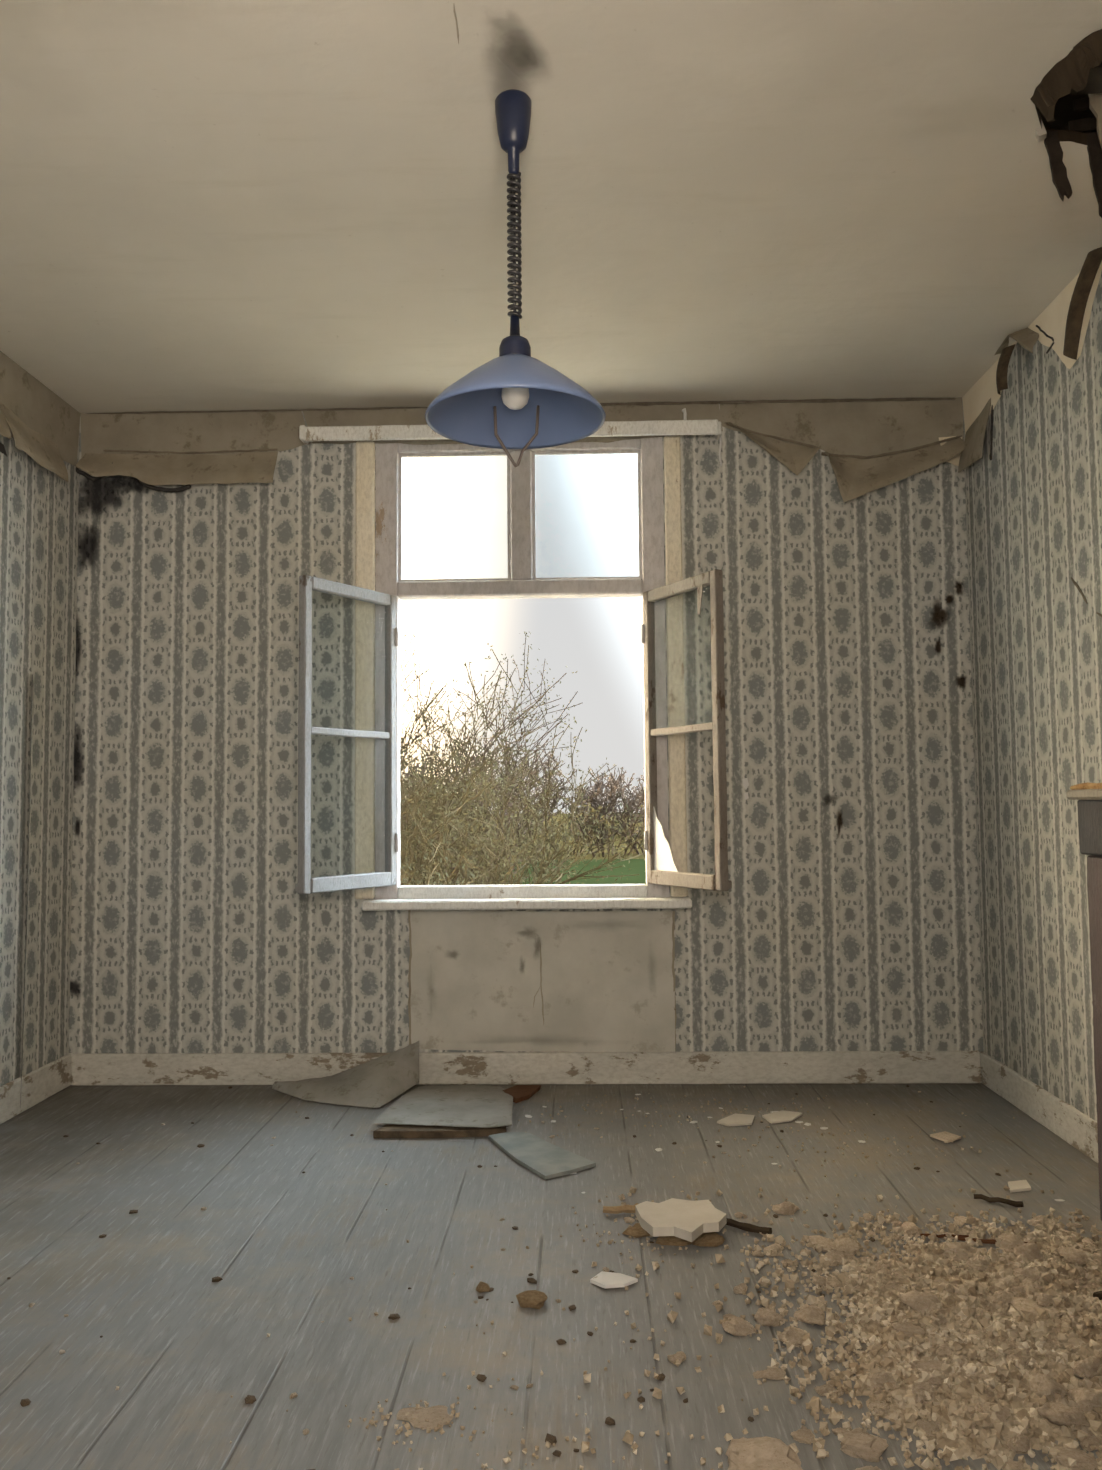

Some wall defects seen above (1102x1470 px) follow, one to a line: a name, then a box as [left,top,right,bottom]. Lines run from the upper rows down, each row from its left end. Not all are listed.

crack [452,6,460,44]
spalling [1030,29,1102,142]
flaking render [572,261,1102,458]
flaking render [0,351,80,467]
flaking render [303,408,464,445]
damp [78,476,148,566]
damp [74,729,83,785]